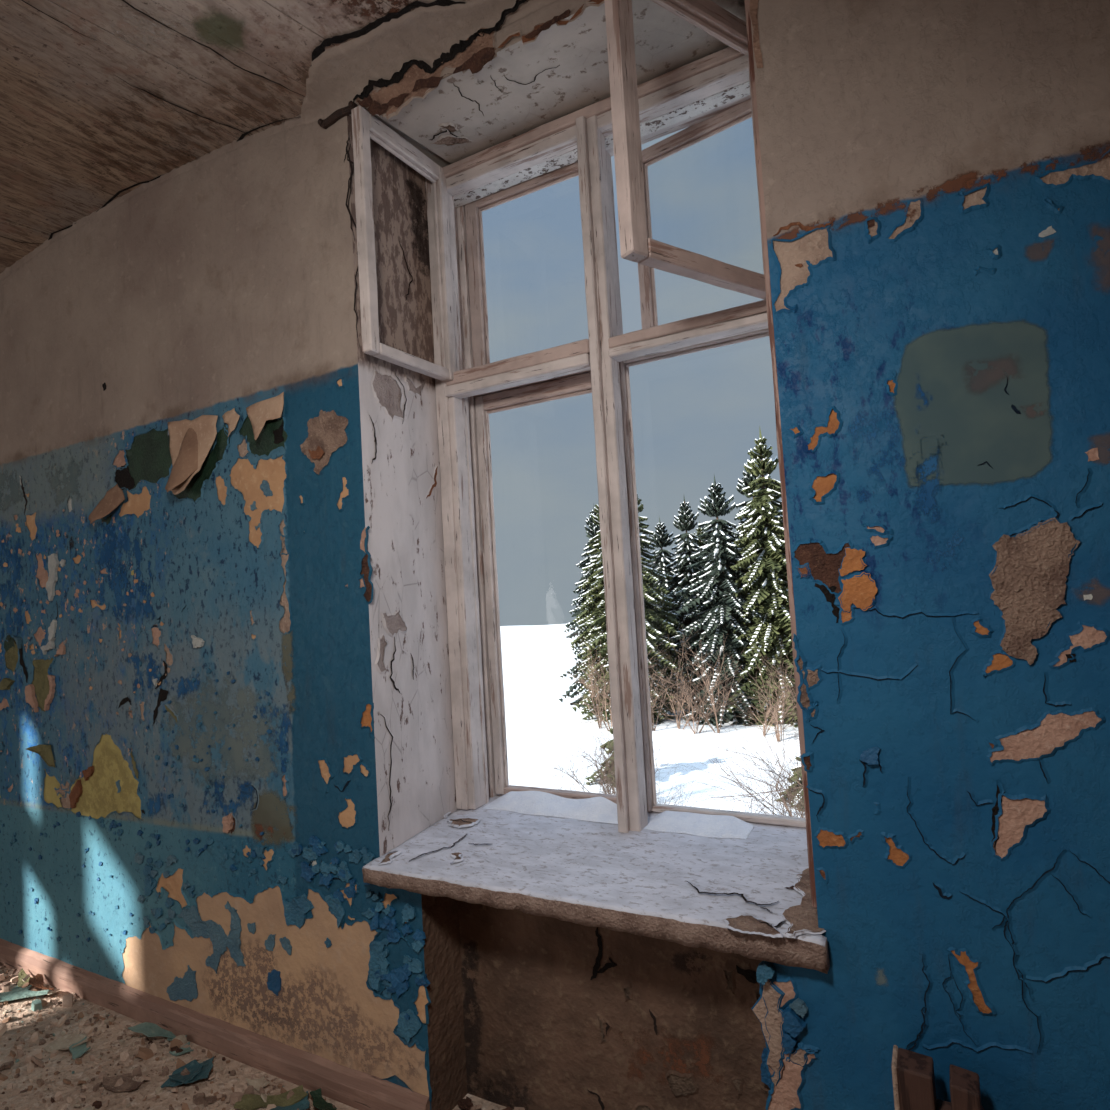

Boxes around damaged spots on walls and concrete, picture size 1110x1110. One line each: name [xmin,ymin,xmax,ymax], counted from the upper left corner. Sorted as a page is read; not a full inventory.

crack [312,0,465,61]
crack [353,0,560,113]
peeling [215,436,306,635]
flaking render [791,523,894,626]
crack [820,602,979,722]
flaking render [970,517,1110,678]
peeling [122,844,432,1102]
crack [409,819,487,861]
crack [687,881,784,928]
peeling [736,961,821,1110]
crack [906,777,1110,1055]
peeling [984,707,1106,861]